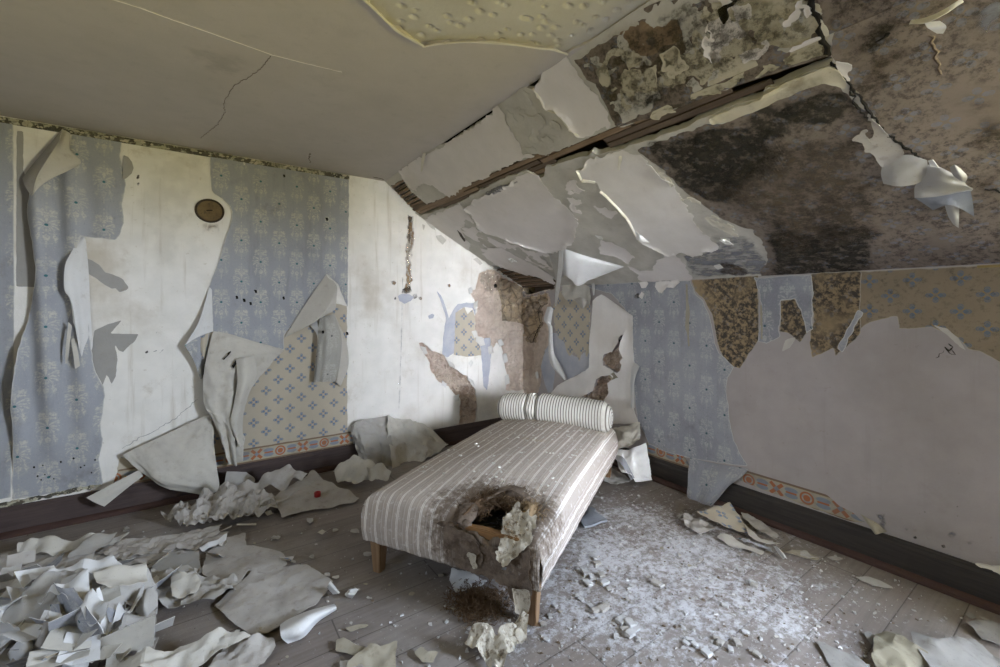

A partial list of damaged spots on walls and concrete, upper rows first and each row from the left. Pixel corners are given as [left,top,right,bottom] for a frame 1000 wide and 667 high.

crack [114,0,341,137]
peeling [392,0,830,245]
water stain [589,0,811,114]
water stain [649,91,879,276]
crack [807,0,921,158]
peeling [852,120,974,228]
flaking render [419,343,477,425]
flaking render [468,258,556,394]
flaking render [584,347,622,401]
peeling [635,280,680,299]